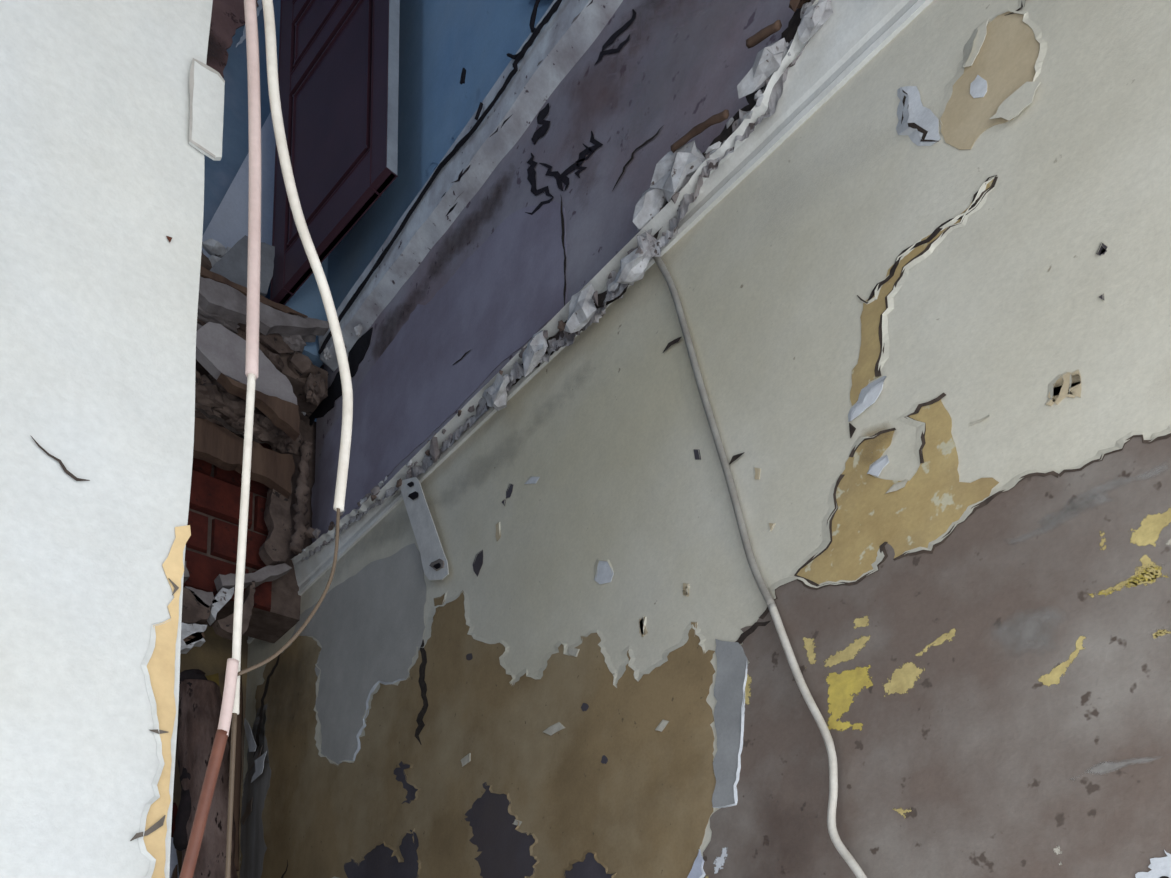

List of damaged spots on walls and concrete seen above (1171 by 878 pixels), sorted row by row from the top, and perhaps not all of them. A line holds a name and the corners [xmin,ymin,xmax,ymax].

crack [525,103,603,306]
crack [595,9,636,65]
crack [613,125,664,190]
flaking render [637,41,809,261]
crack [901,90,939,142]
peeling [848,176,998,422]
crack [856,175,997,304]
peeling [896,9,1047,150]
flaking render [301,200,634,562]
peeling [1045,370,1081,406]
crack [415,639,428,744]
peeling [240,392,1171,878]